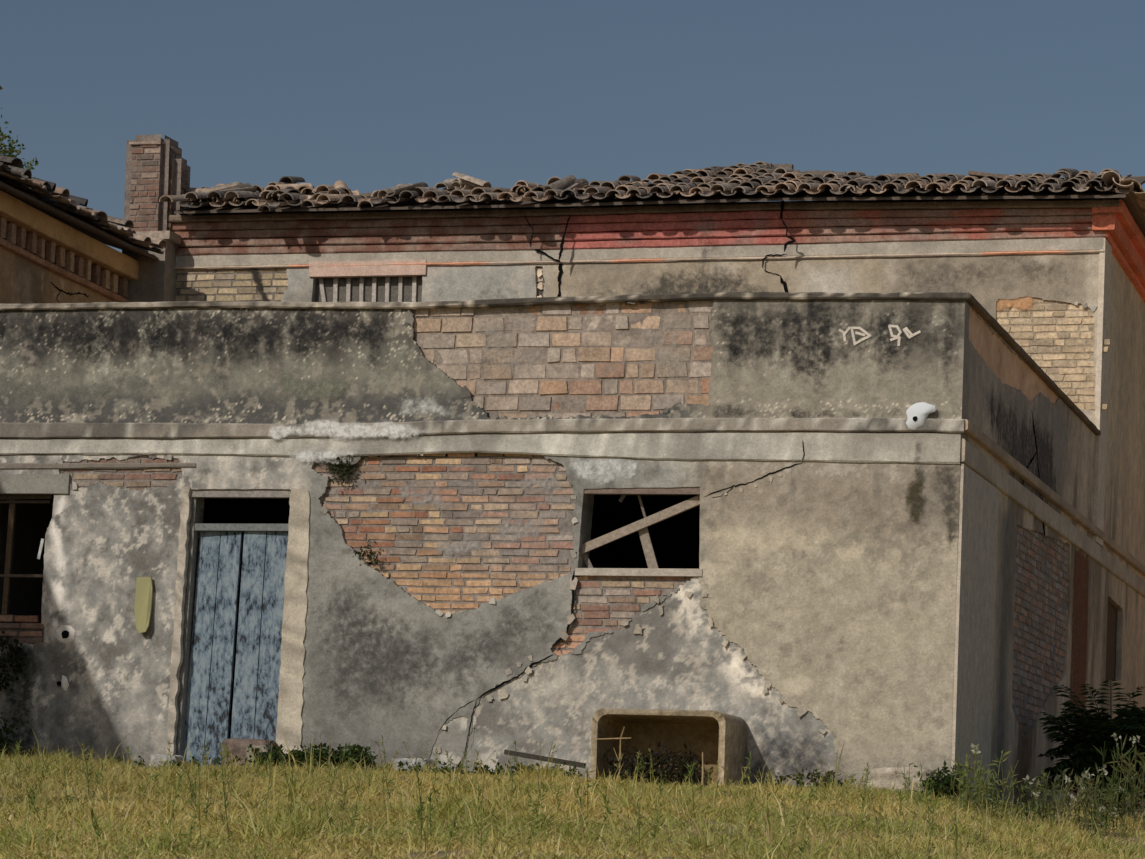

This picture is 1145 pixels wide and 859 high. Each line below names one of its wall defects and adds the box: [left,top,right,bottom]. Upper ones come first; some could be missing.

flaking render [176,262,288,302]
crack [524,214,570,297]
crack [762,195,795,292]
flaking render [405,270,714,420]
damp [723,302,847,372]
damp [879,316,909,363]
flaking render [969,297,1111,410]
crack [703,440,804,498]
damp [906,467,924,522]
damp [937,467,958,541]
peeling [269,398,845,787]
crack [437,572,575,757]